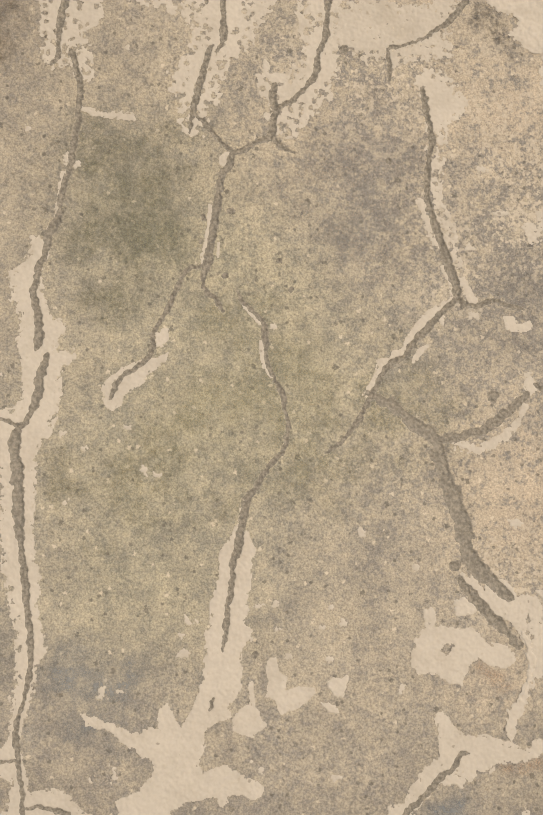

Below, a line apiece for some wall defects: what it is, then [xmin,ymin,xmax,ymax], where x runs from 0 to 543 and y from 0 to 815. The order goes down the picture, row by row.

crack [0,0,85,815]
peeling [0,151,93,815]
peeling [36,0,104,82]
peeling [101,328,169,411]
peeling [129,0,277,138]
crack [109,0,333,652]
peeling [255,0,479,398]
crack [386,0,469,83]
crack [324,87,543,650]
peeling [80,500,289,815]
crack [402,751,470,815]
peeling [387,560,543,815]